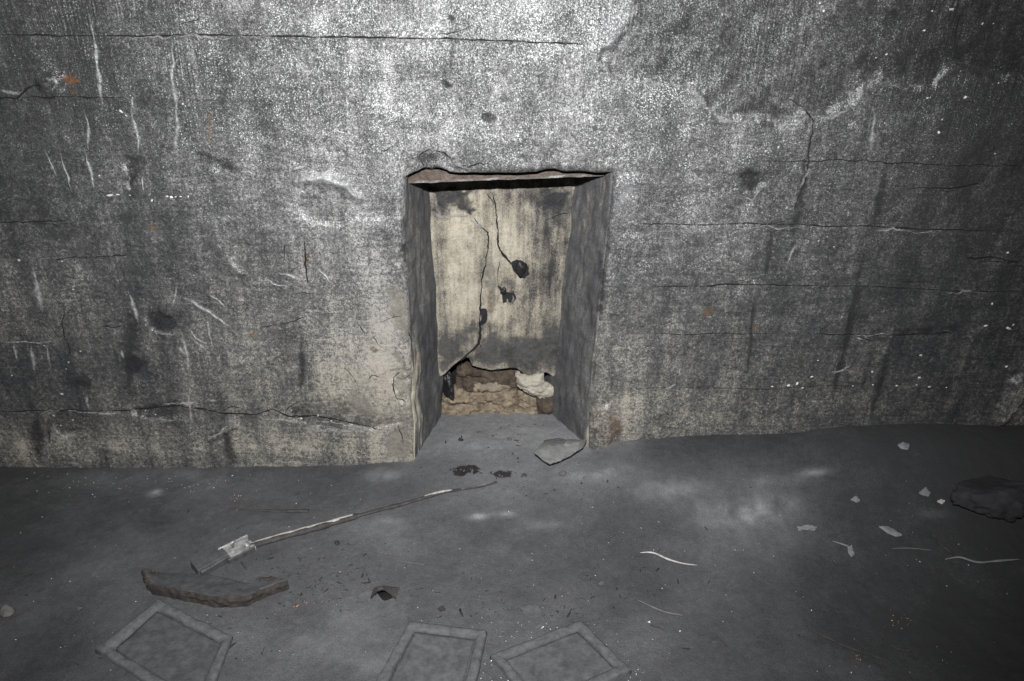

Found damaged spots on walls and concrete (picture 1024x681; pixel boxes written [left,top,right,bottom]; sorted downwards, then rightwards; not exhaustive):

crack [9,19,584,46]
crack [642,99,1016,234]
crack [438,194,511,361]
crack [657,279,817,287]
crack [346,316,413,401]
spalling [441,358,554,416]
crack [7,402,403,440]